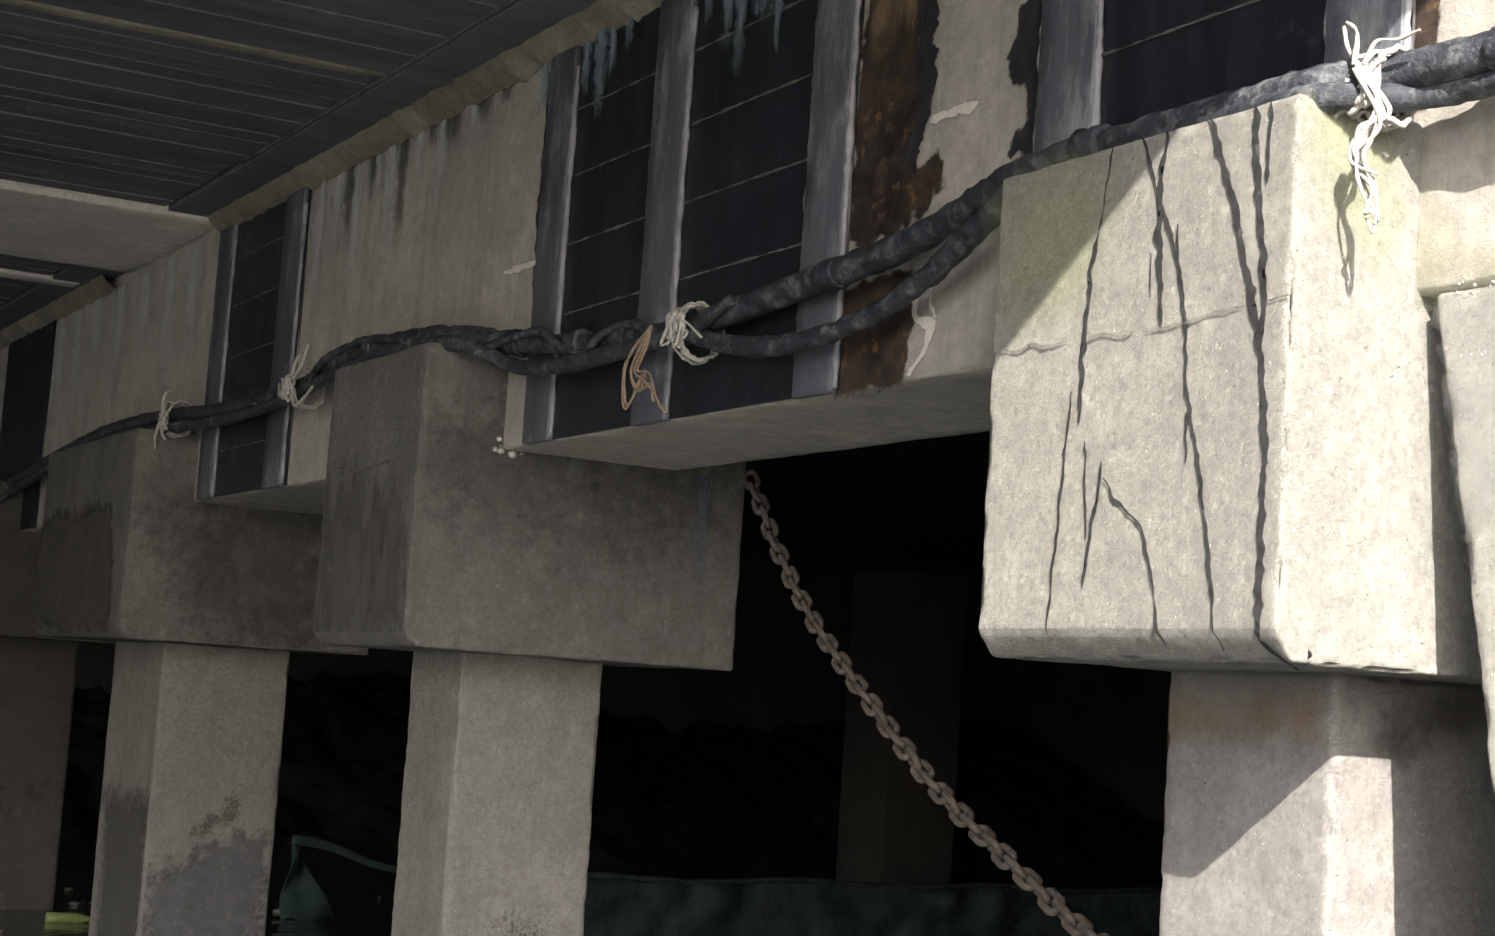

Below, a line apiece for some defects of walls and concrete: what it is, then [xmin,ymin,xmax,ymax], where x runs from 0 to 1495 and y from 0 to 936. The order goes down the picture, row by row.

damp [582,18,632,97]
damp [706,0,746,29]
rust [849,0,944,247]
rust [843,269,913,316]
rust [834,303,915,397]
crack [999,102,1299,671]
damp [97,786,268,936]